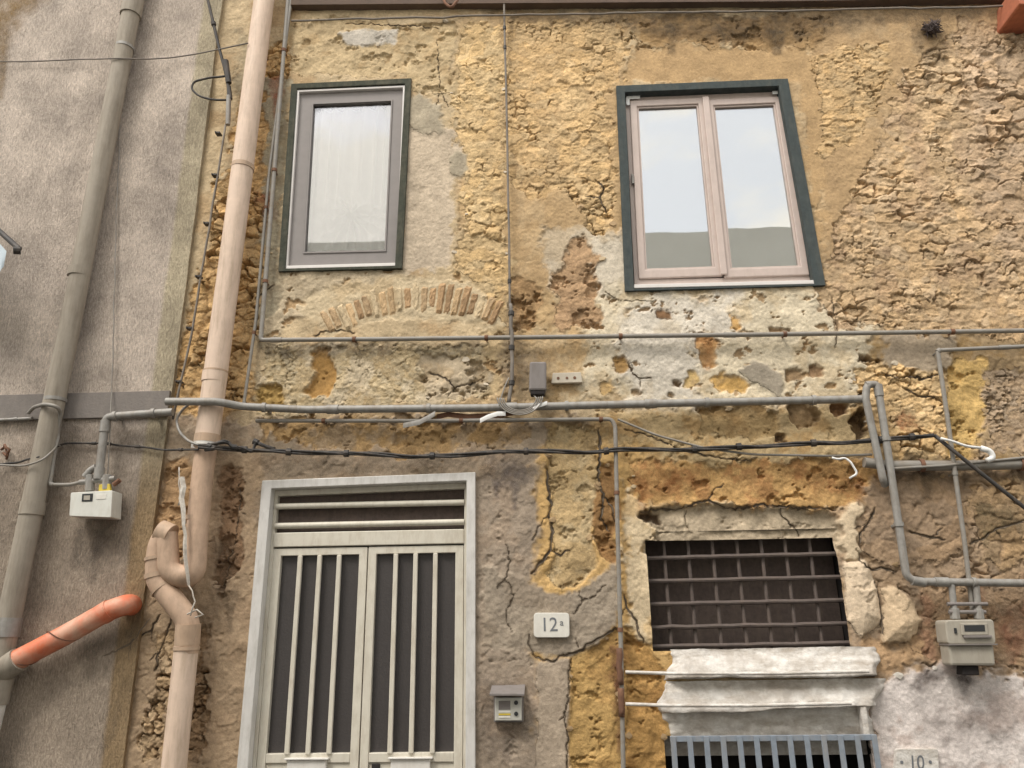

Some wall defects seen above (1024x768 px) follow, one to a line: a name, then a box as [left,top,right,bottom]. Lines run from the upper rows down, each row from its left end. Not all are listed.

spalling [172,167,231,417]
spalling [222,9,1024,590]
spalling [156,454,192,559]
spalling [210,464,246,598]
crack [596,431,615,531]
crack [640,484,835,535]
crack [103,615,172,671]
spalling [137,629,175,763]
spalling [188,625,212,763]
crack [496,470,644,768]
spalling [566,629,668,768]